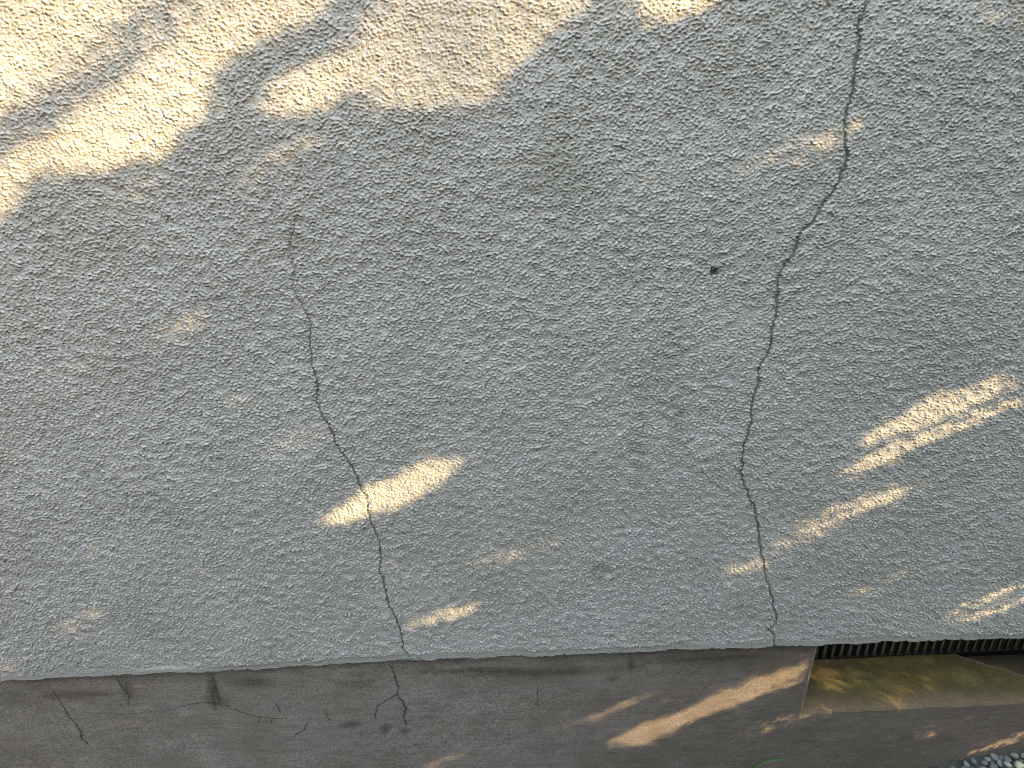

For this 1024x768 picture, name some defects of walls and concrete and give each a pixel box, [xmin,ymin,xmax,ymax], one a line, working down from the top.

crack [54,693,89,745]
crack [261,284,409,725]
crack [739,1,867,645]